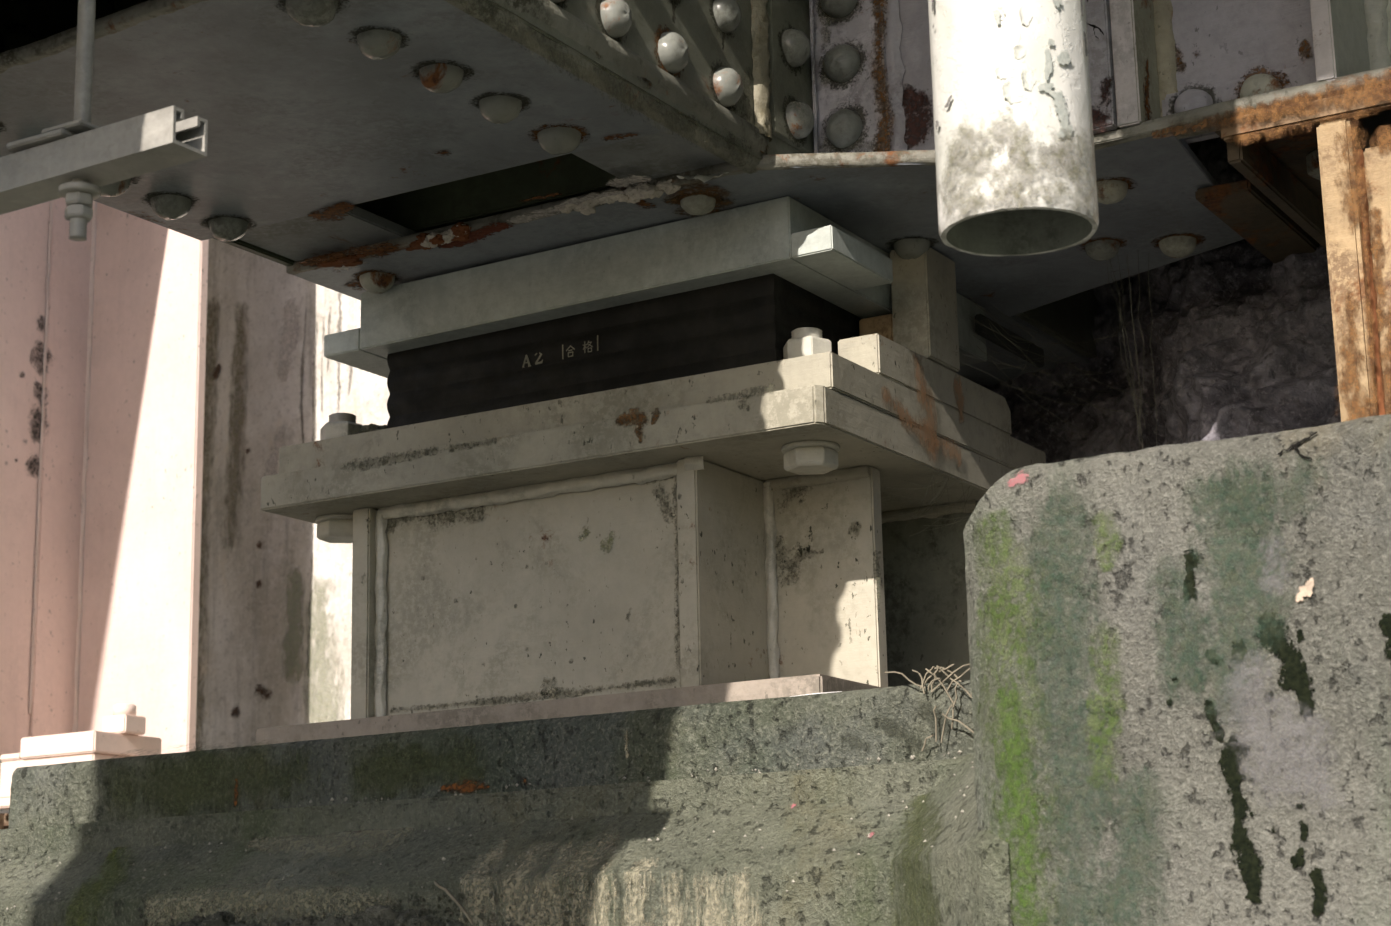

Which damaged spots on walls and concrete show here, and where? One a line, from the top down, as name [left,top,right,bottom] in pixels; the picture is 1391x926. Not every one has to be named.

corrosion [871,0,934,152]
corrosion [1091,76,1113,132]
corrosion [308,202,354,221]
corrosion [300,222,514,291]
corrosion [1143,59,1391,420]
water stain [198,305,246,642]
water stain [264,292,352,476]
corrosion [615,408,661,443]
water stain [282,569,342,723]
water stain [1155,466,1315,903]
water stain [1378,613,1391,663]
water stain [1290,803,1328,917]